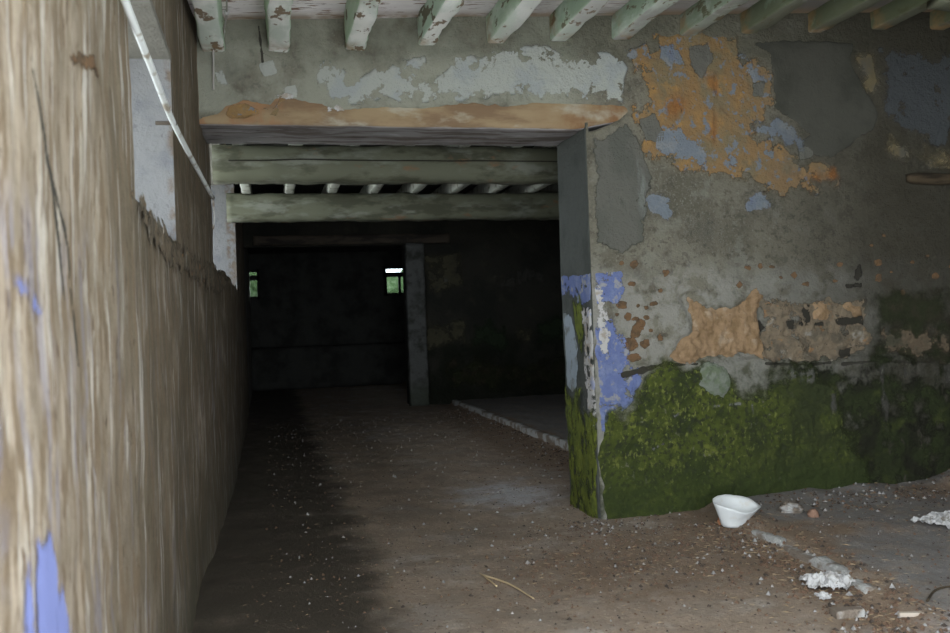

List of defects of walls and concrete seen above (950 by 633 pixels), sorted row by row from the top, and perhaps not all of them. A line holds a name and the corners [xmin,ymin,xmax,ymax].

flaking render [70,51,99,78]
flaking render [226,85,297,119]
peeling [259,60,277,77]
peeling [317,32,840,212]
peeling [855,47,950,168]
peeling [561,260,663,432]
flaking render [670,281,950,398]